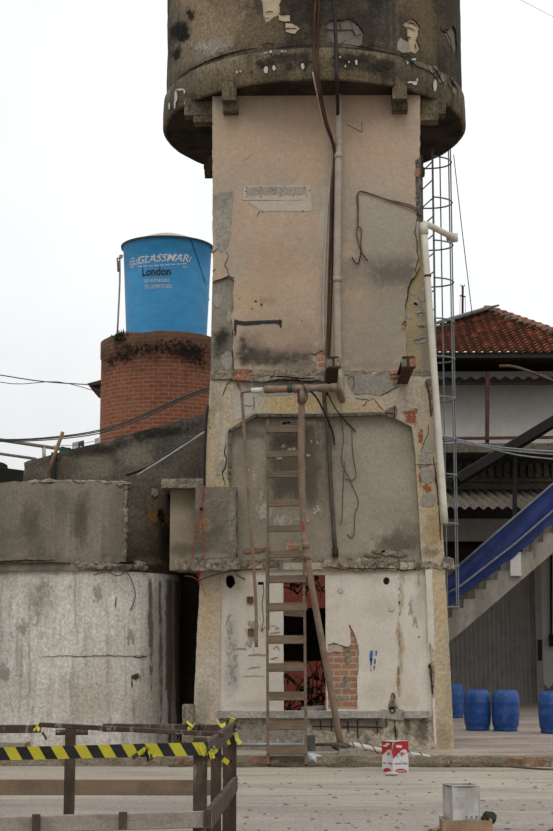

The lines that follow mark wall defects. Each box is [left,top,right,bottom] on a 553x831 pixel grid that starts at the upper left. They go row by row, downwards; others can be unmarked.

damp [169,7,194,60]
spalling [261,0,300,34]
spalling [326,19,394,71]
spalling [397,19,419,53]
flaking render [213,191,233,253]
spalling [211,277,320,421]
damp [240,338,304,364]
flaking render [401,155,441,540]
flaking render [347,371,401,395]
spalling [385,405,398,419]
flaking render [310,622,399,739]